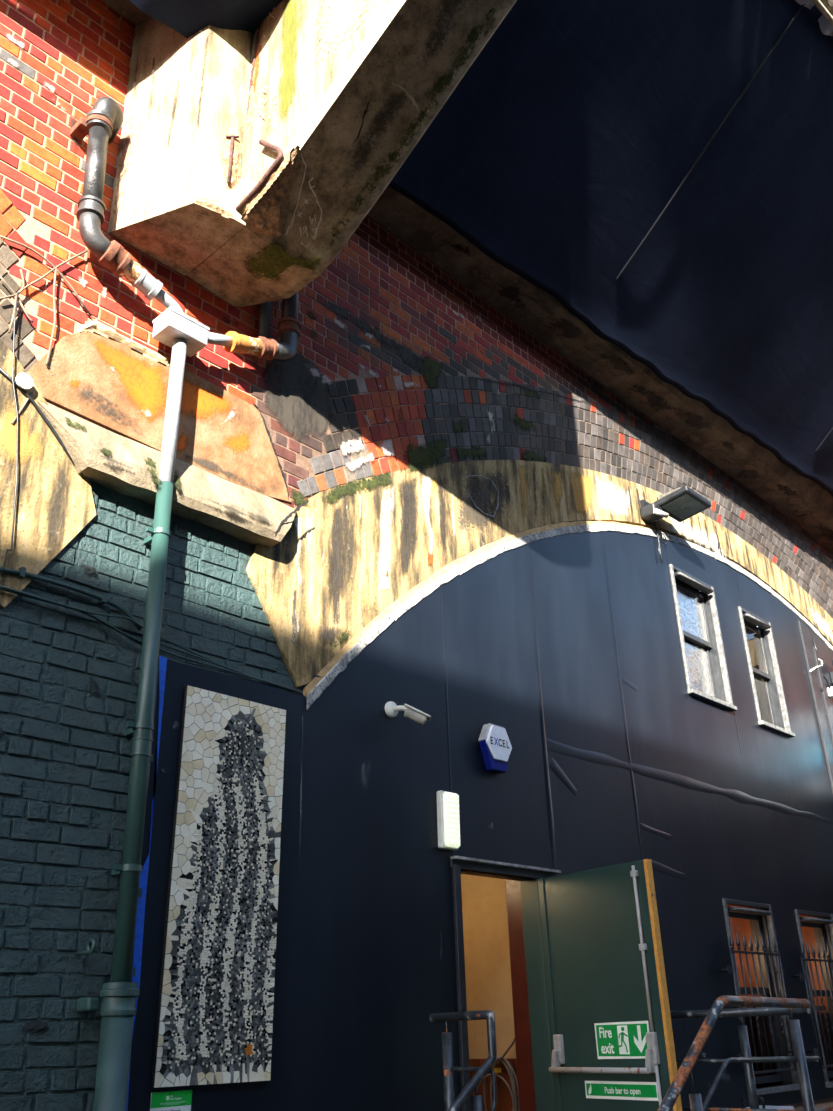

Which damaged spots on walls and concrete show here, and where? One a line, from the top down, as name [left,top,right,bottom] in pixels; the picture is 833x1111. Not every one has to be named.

damp [278,0,300,118]
damp [347,94,406,177]
corrosion [94,340,166,420]
corrosion [181,380,231,419]
damp [0,411,41,462]
corrosion [177,433,188,451]
corrosion [224,434,250,455]
damp [364,464,645,590]
damp [670,516,729,558]
damp [292,506,343,646]
damp [811,608,833,641]